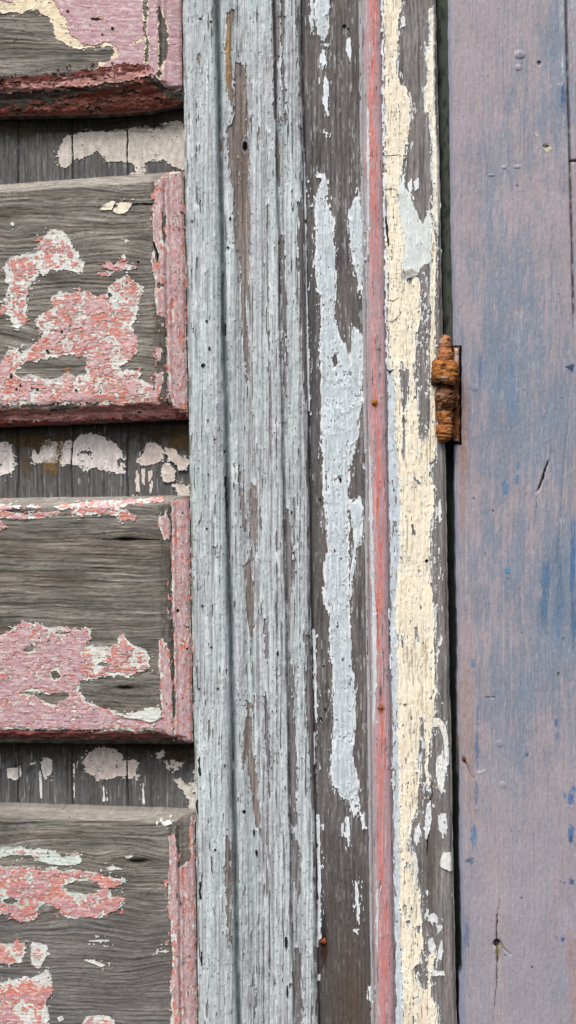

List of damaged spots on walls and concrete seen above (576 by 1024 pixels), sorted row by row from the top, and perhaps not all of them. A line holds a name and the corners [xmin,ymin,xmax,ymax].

peeling [0,0,183,117]
peeling [233,0,449,1024]
peeling [0,120,203,1024]
peeling [440,852,452,871]
crack [494,898,508,1005]